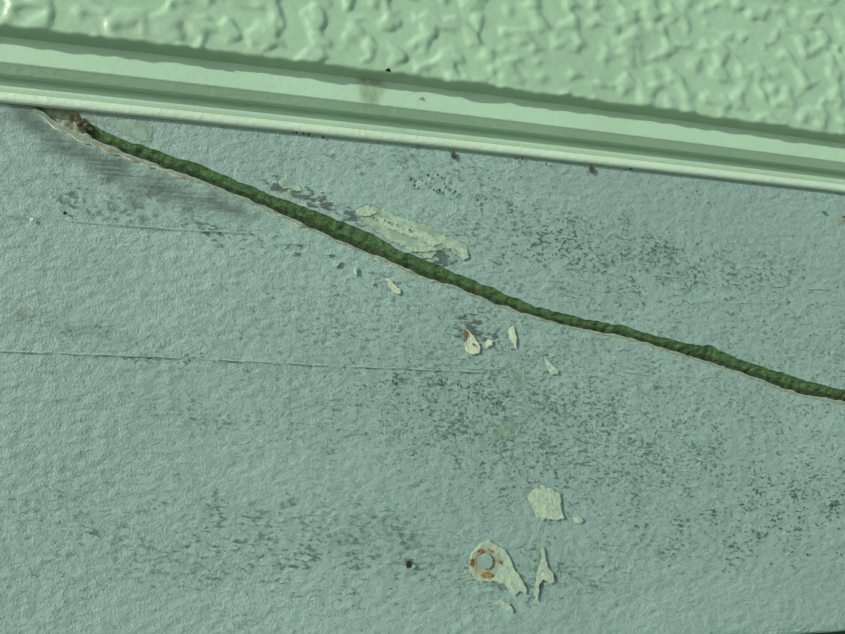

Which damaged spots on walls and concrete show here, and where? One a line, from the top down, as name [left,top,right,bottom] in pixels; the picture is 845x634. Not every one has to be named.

peeling [265,175,469,267]
crack [0,107,845,405]
peeling [448,313,517,354]
peeling [528,485,564,521]
peeling [469,540,555,613]